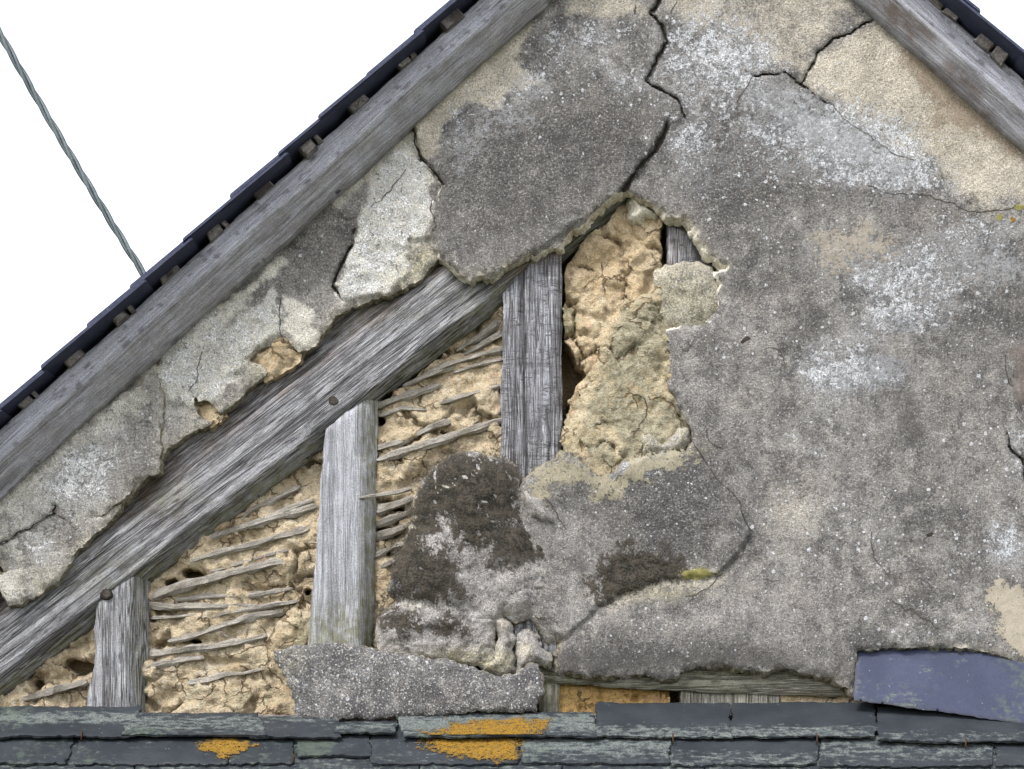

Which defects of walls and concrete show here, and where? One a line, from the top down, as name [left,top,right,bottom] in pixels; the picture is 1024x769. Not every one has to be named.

crack [622,0,686,192]
crack [737,11,916,161]
crack [331,128,442,299]
crack [868,185,1016,213]
spalling [252,337,306,384]
flaking render [431,190,729,479]
crack [0,505,76,544]
water stain [373,444,702,646]
crack [629,392,753,596]